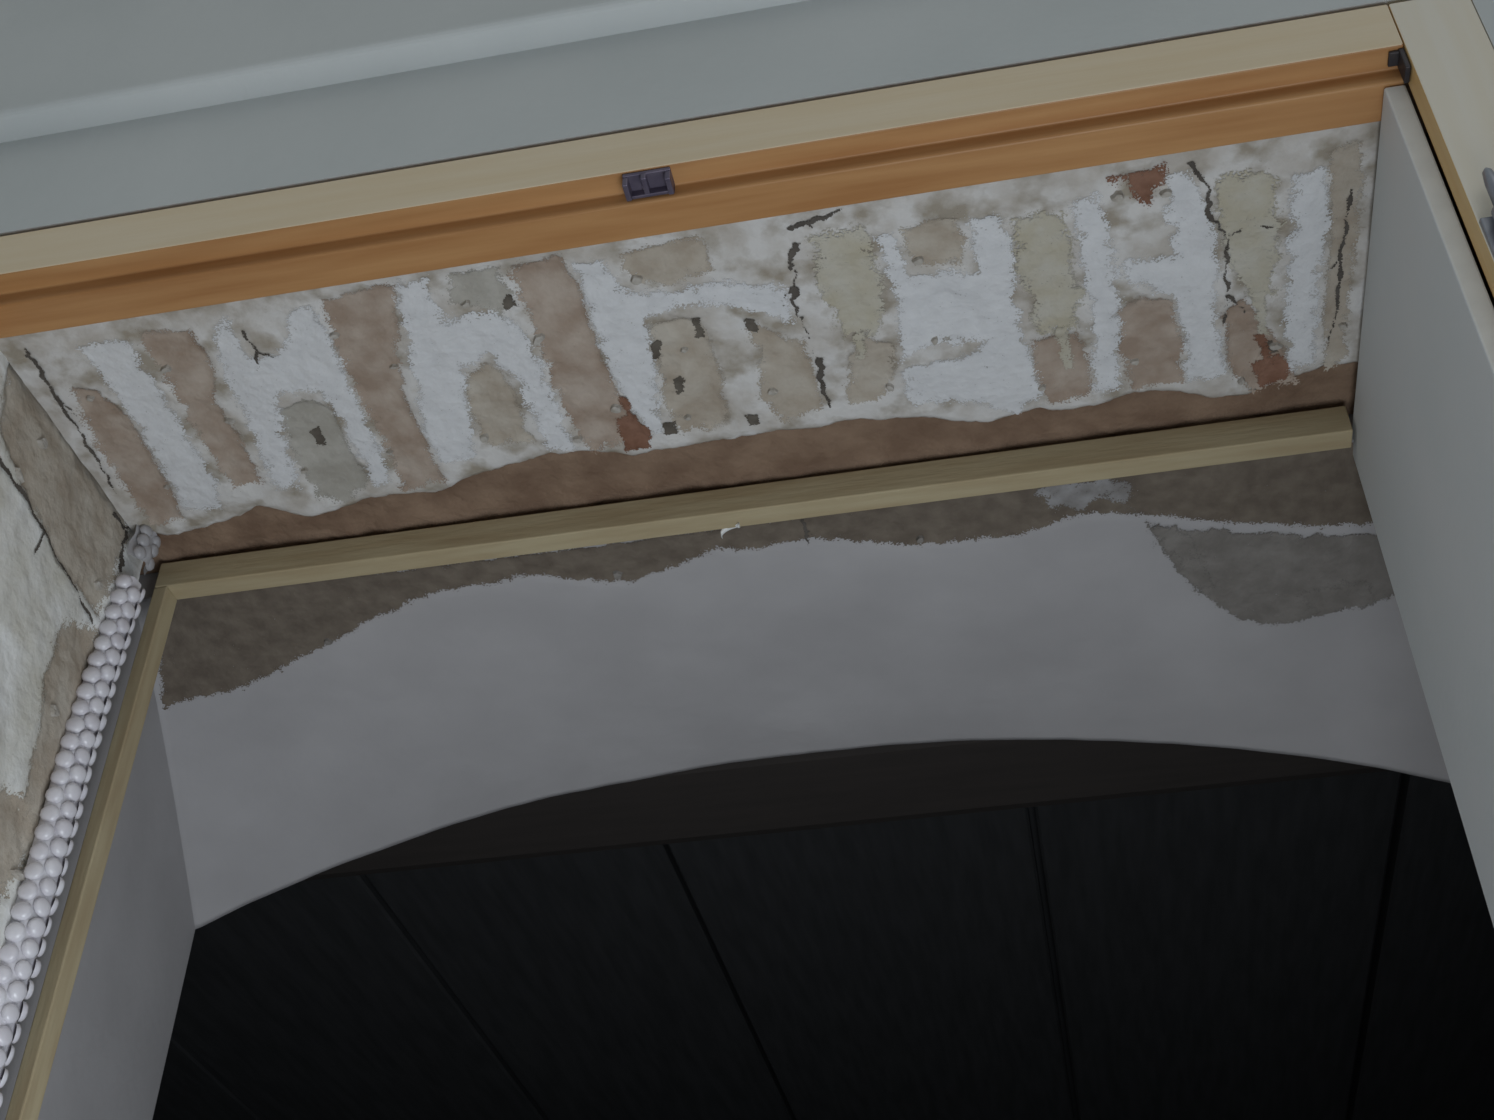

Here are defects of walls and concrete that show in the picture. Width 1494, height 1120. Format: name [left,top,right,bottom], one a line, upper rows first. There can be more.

crack [0,457,93,624]
crack [24,349,131,572]
flaking render [0,364,185,905]
flaking render [139,328,265,492]
flaking render [319,281,449,492]
flaking render [442,255,641,454]
flaking render [647,316,824,436]
flaking render [158,443,1373,710]
crack [783,209,842,408]
flaking render [1106,162,1172,207]
crack [1187,161,1273,324]
flaking render [1320,140,1367,371]